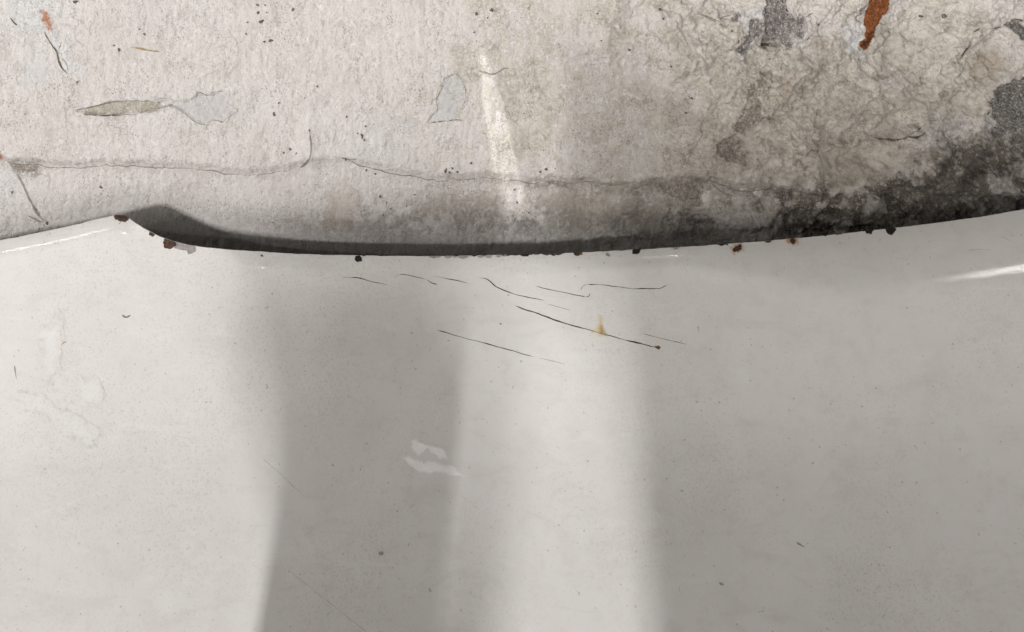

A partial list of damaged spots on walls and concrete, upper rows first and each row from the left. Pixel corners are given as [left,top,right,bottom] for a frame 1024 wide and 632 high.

spalling [730,0,870,62]
corrosion [859,0,890,51]
peeling [74,90,238,127]
damp [757,63,815,117]
crack [0,135,312,222]
crack [342,158,653,189]
damp [881,125,1024,227]
crack [439,330,559,363]
crack [350,274,684,347]
corrosion [590,314,608,338]